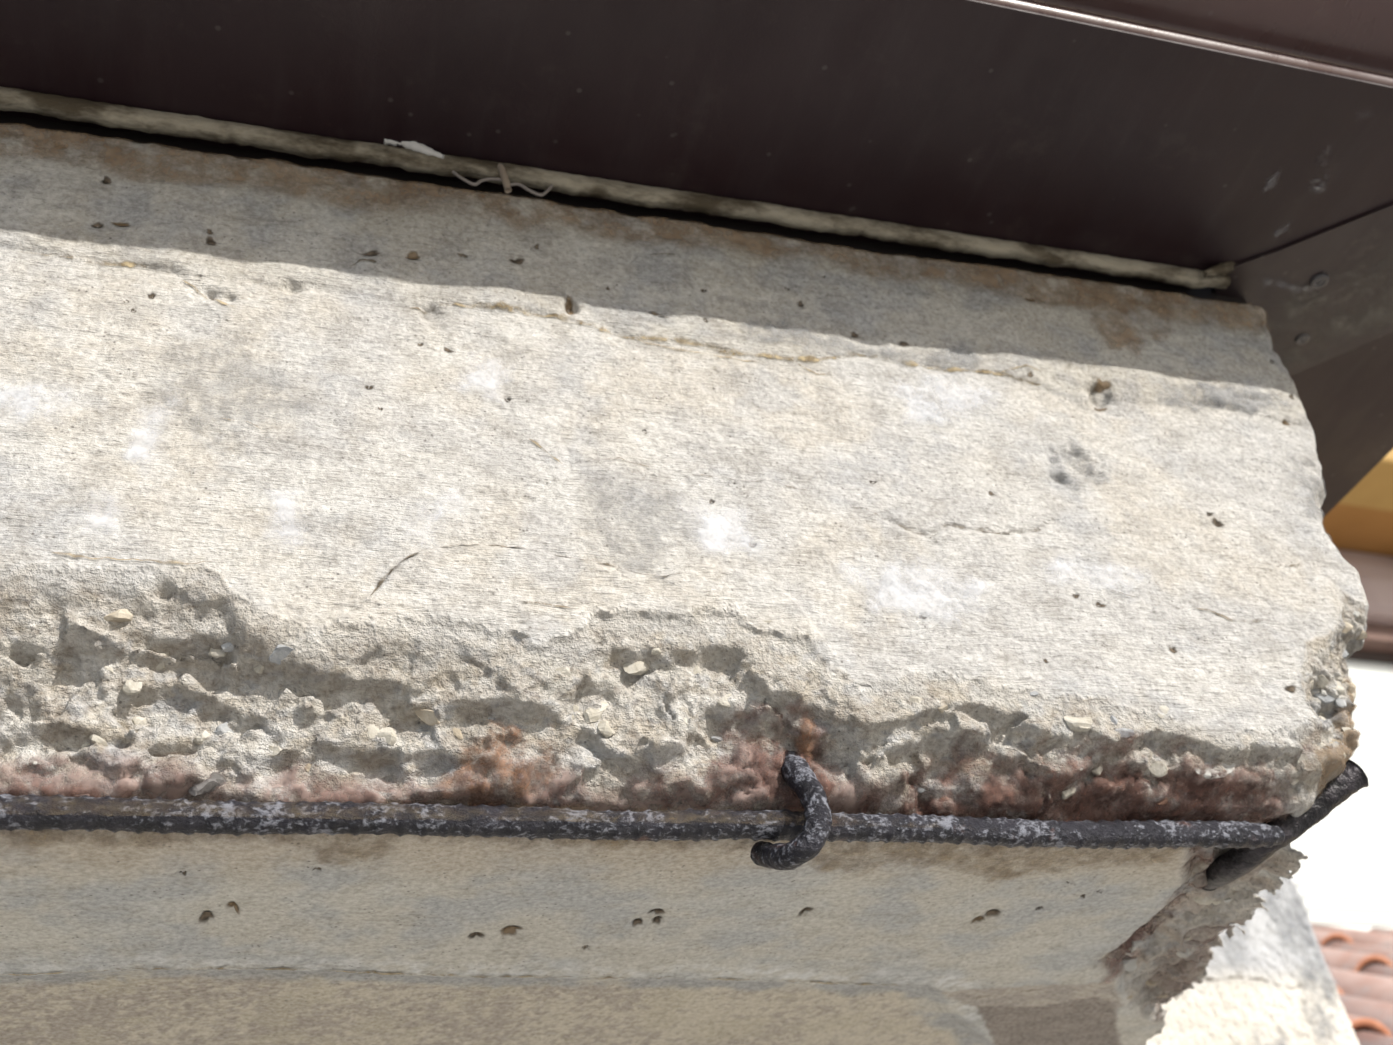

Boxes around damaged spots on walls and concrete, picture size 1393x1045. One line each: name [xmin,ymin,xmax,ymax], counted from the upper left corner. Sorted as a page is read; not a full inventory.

crack [415,302,1041,385]
spalling [0,561,1369,823]
rust [0,758,244,847]
rust [263,706,1285,841]
spalling [502,926,521,935]
spalling [633,908,664,926]
spalling [972,910,1000,923]
spalling [1098,844,1308,1045]